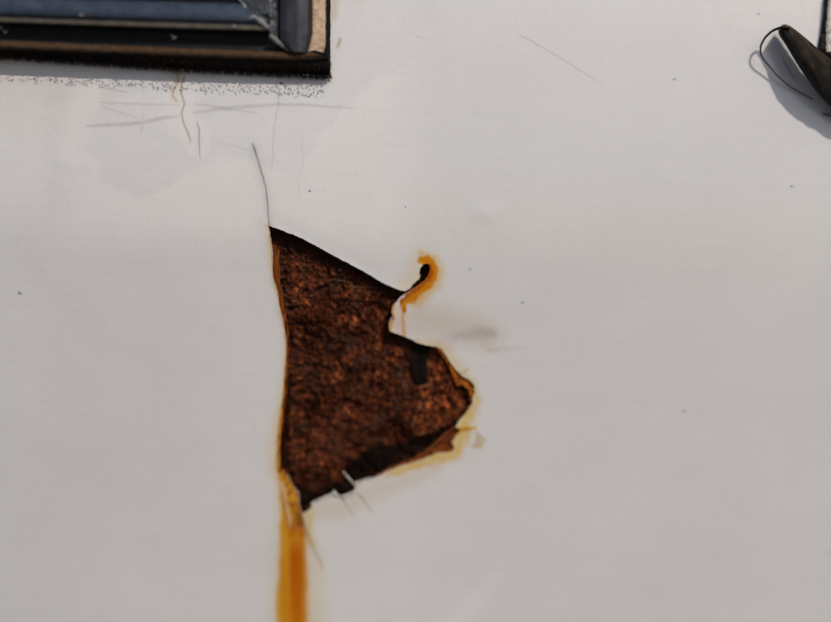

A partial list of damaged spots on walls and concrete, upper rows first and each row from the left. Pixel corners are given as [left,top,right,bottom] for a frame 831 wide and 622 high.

peeling [269,226,475,513]